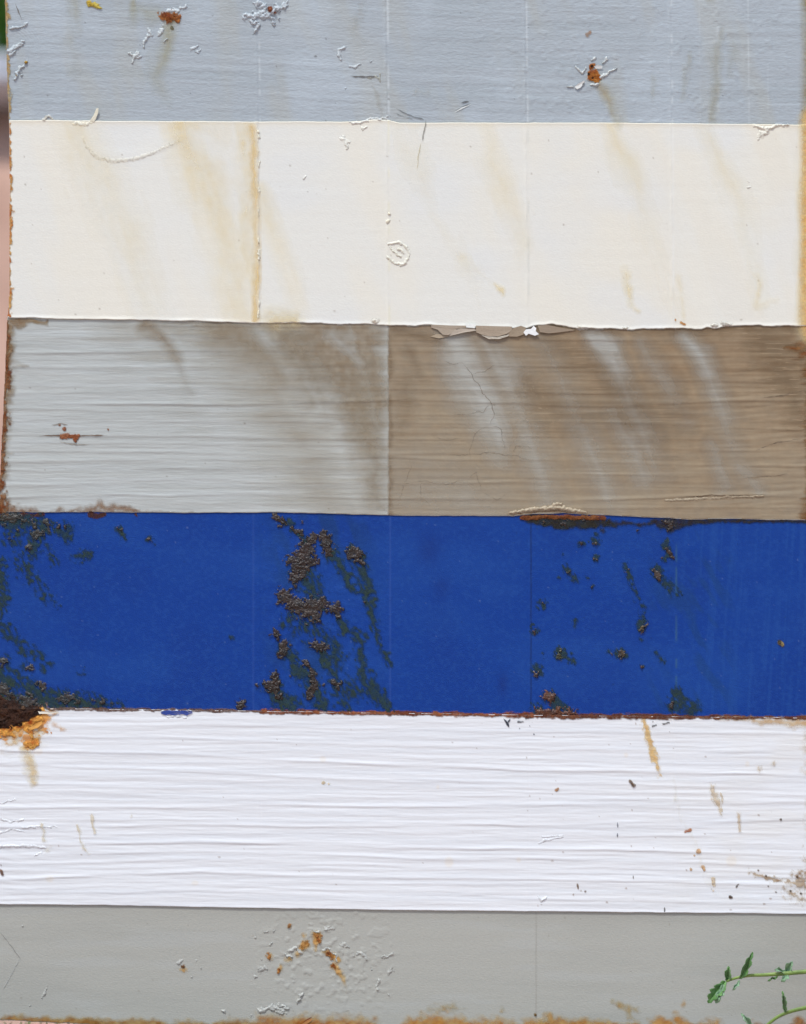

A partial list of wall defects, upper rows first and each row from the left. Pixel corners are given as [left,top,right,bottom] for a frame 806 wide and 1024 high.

peeling [241,0,291,35]
water stain [207,322,264,354]
peeling [431,324,589,339]
rust [0,0,806,770]
water stain [272,323,806,519]